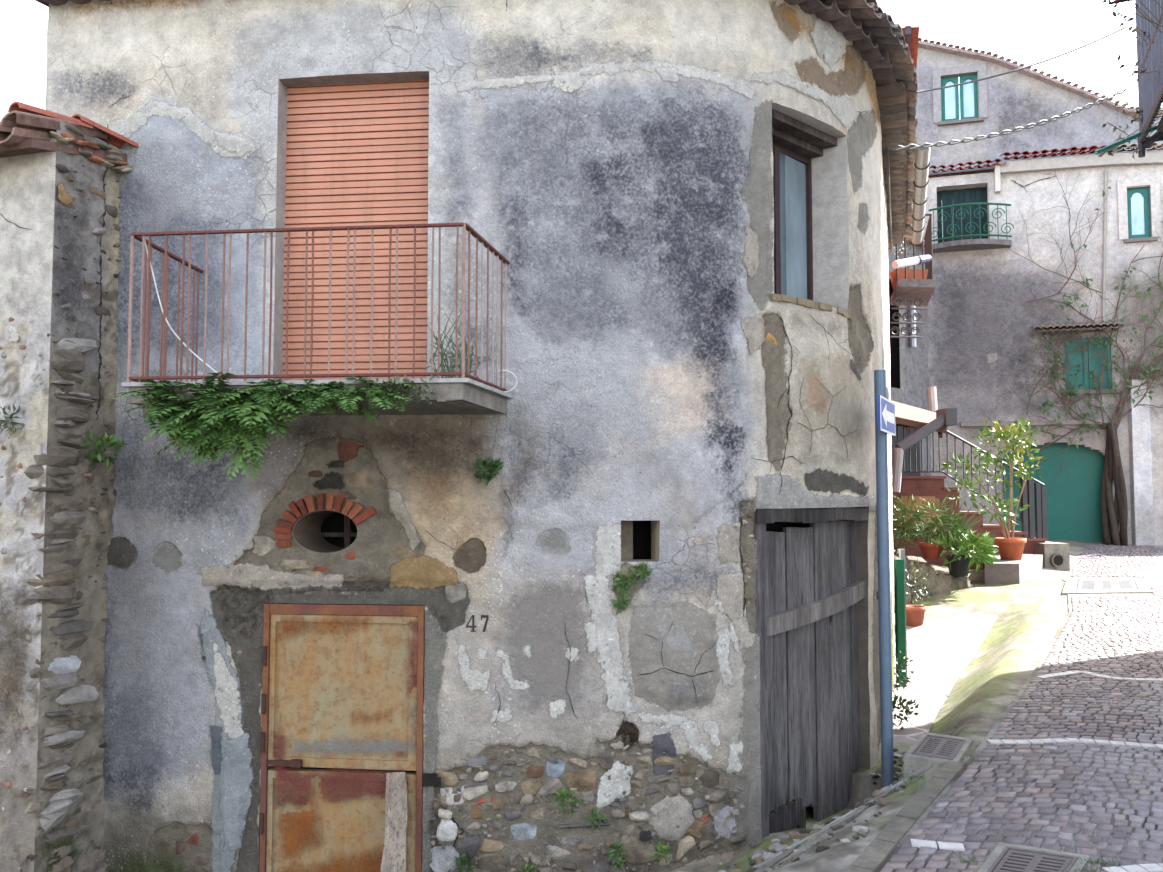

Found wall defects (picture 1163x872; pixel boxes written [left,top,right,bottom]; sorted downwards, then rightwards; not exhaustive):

peeling [114,100,261,161]
leakage [489,93,748,452]
flaking render [455,2,878,471]
crack [751,311,857,491]
flaking render [805,469,869,496]
flaking render [147,436,748,872]
corrosion [281,801,315,855]
corrosion [288,853,383,872]